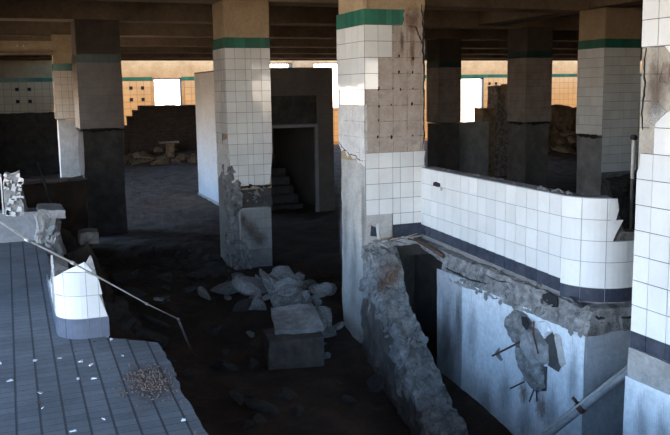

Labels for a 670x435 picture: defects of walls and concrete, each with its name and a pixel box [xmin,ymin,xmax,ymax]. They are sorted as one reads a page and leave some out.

spalling [338,10,425,167]
crack [413,4,425,149]
spalling [638,46,670,169]
spalling [217,139,273,270]
spalling [383,237,632,402]